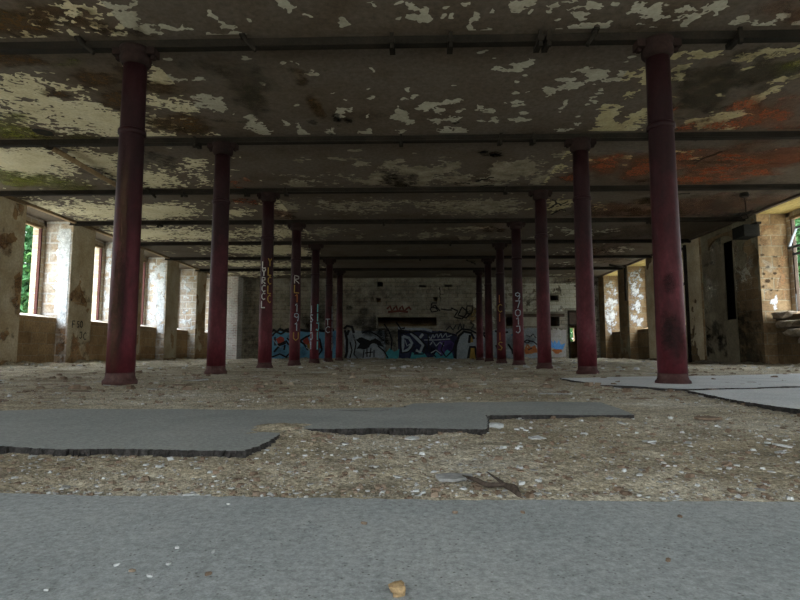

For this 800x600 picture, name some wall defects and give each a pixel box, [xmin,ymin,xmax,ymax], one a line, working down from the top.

peeling [0,0,194,38]
peeling [394,0,454,23]
peeling [546,0,620,29]
peeling [626,0,730,27]
peeling [0,71,120,137]
peeling [147,58,206,85]
peeling [145,92,273,136]
peeling [390,50,536,133]
peeling [542,56,647,131]
peeling [670,44,800,130]
rust [675,89,800,131]
peeling [143,157,214,188]